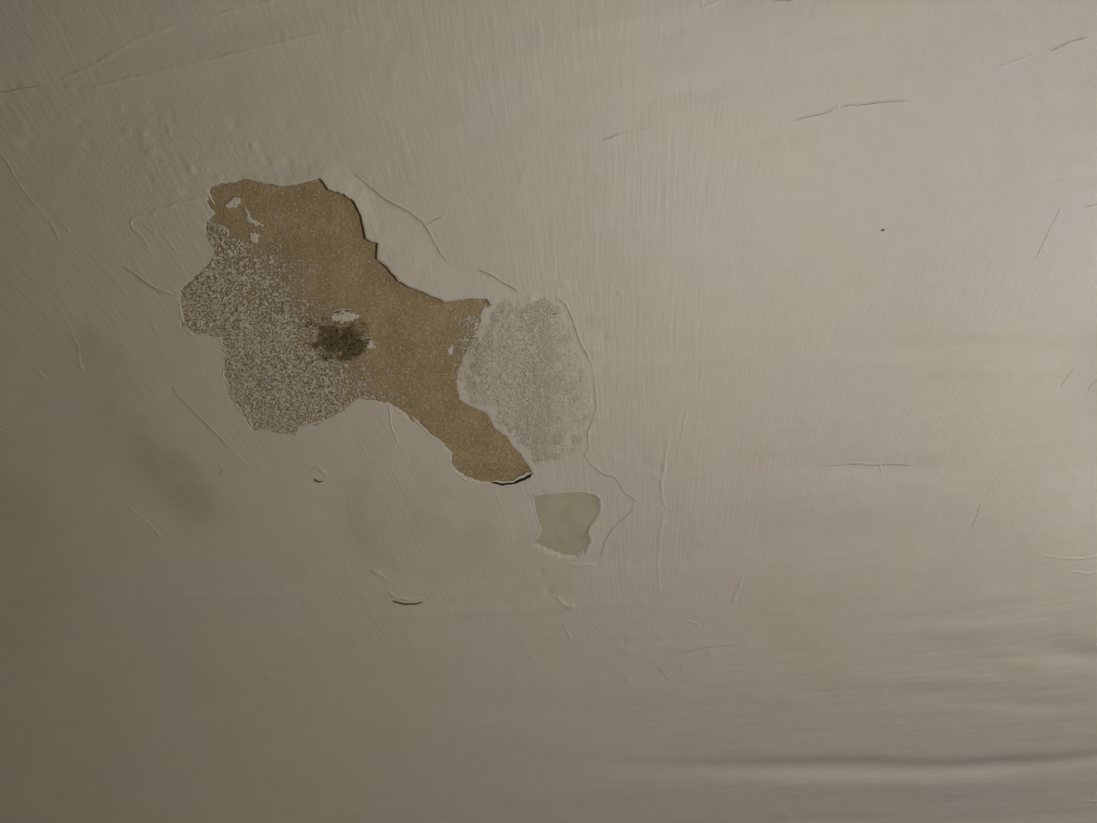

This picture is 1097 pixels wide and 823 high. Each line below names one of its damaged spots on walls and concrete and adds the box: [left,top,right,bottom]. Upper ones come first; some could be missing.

peeling [121,158,603,561]